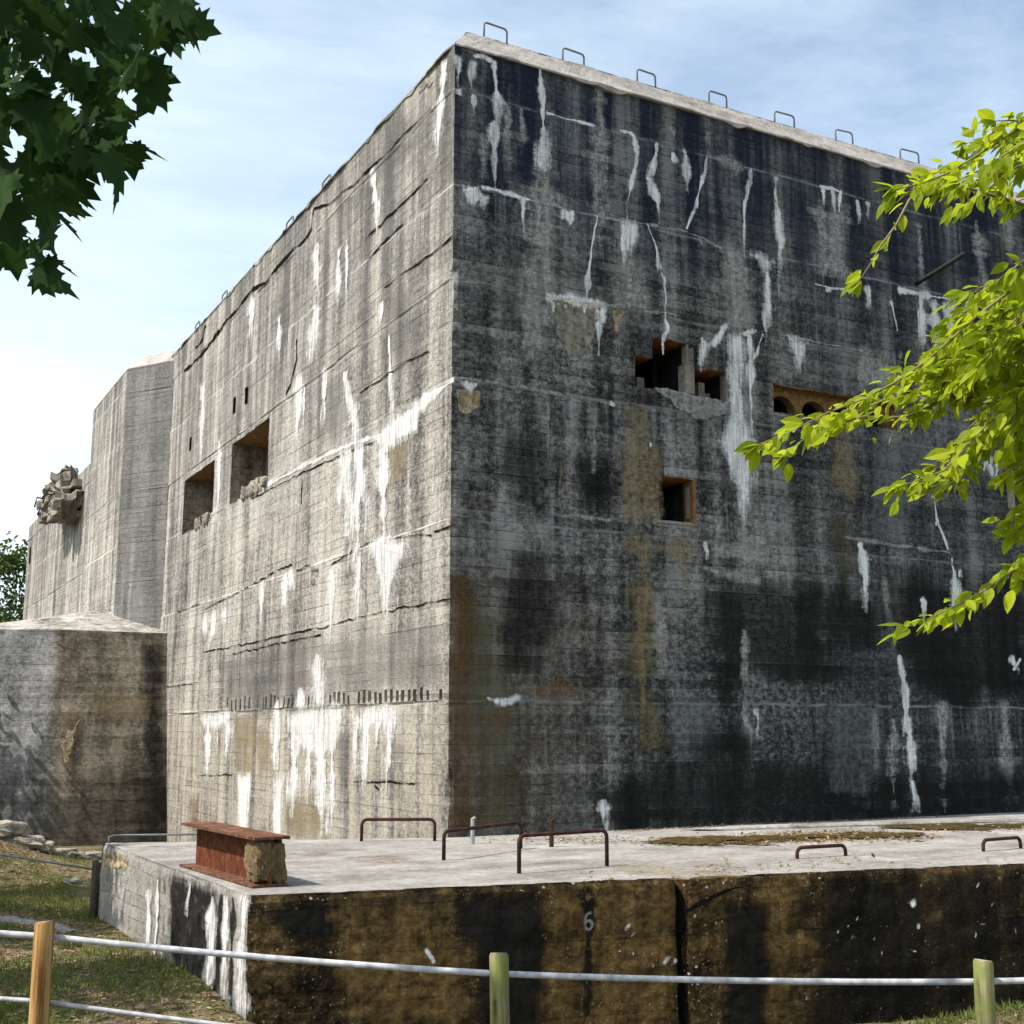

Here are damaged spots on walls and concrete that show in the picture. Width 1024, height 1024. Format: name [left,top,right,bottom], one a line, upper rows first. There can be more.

crack [285,339,297,395]
crack [184,109,430,373]
leakage [268,334,454,619]
spalling [457,381,481,414]
leakage [435,54,648,359]
spalling [544,299,625,362]
leakage [699,157,785,520]
leakage [201,654,398,839]
crack [205,598,453,655]
leakage [598,517,1024,830]
leakage [262,865,686,1024]
leakage [722,864,1024,1024]